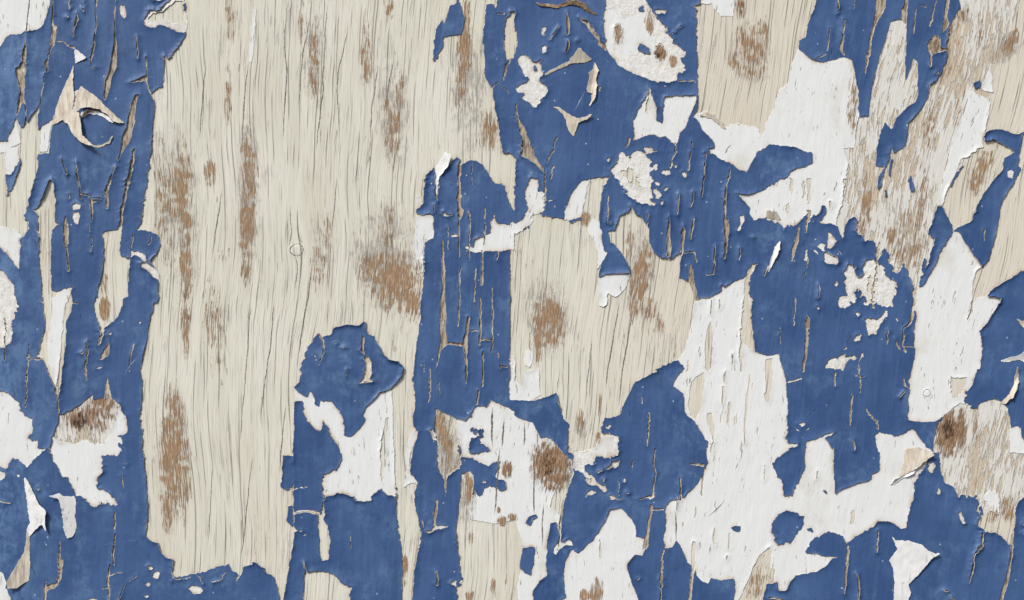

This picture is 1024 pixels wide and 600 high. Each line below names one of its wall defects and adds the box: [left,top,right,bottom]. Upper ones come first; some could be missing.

peeling [0,0,52,46]
peeling [0,49,127,600]
peeling [94,0,516,600]
peeling [430,0,1024,600]